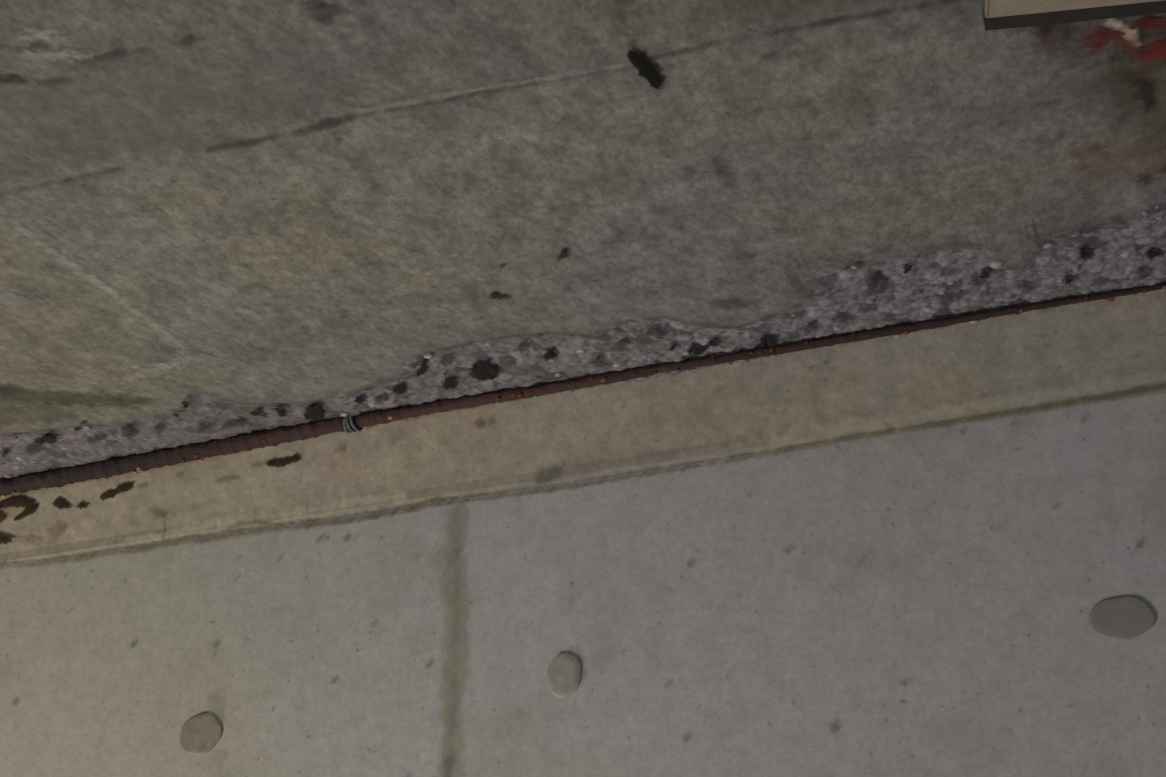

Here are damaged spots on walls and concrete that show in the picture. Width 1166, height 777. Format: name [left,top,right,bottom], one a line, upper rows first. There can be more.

crack [301,120,349,132]
spalling [0,193,1166,479]
rust [266,454,299,467]
rust [88,467,141,500]
rust [0,492,38,544]
rust [52,498,88,509]